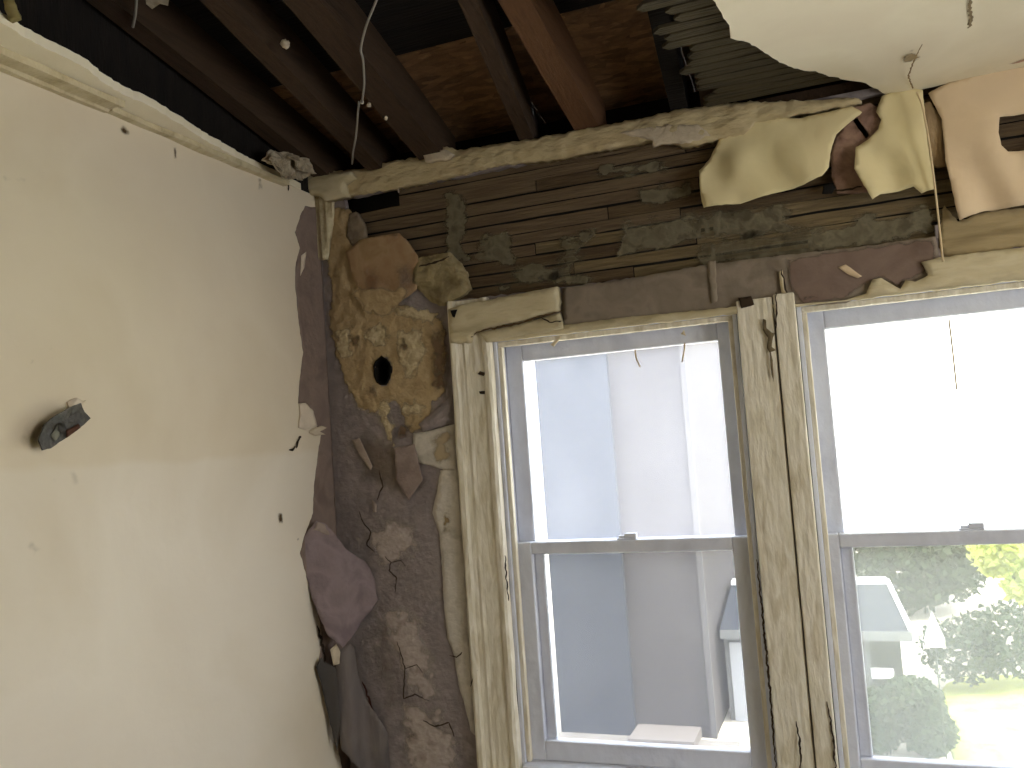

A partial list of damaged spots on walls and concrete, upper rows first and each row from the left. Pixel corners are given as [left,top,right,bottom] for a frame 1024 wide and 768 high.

flaking render [346,84,1024,347]
peeling [295,206,337,584]
peeling [419,395,454,432]
peeling [352,438,372,470]
peeling [394,444,423,500]
crack [359,471,405,592]
peeling [314,603,343,667]
crack [362,682,375,712]
crack [397,642,455,737]
crack [756,559,802,768]
peeling [338,736,350,768]
crack [827,703,837,768]